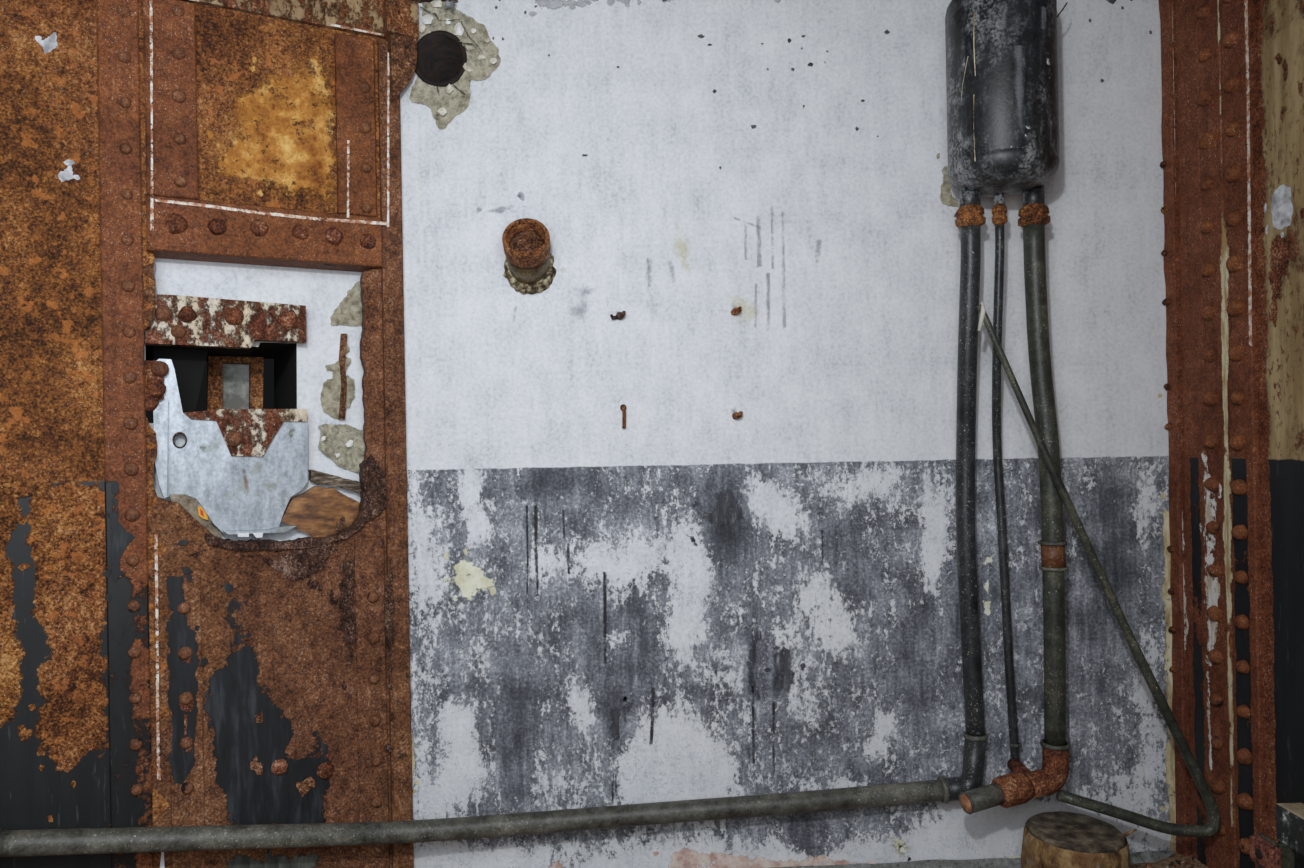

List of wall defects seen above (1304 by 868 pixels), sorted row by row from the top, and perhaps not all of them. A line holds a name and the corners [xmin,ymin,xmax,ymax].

spalling [409,0,504,129]
corrosion [1275,53,1303,97]
peeling [1264,184,1293,238]
corrosion [1258,226,1295,327]
spalling [318,281,365,472]
corrosion [248,523,339,591]
peeling [443,548,496,601]
corrosion [0,474,109,788]
corrosion [250,756,263,775]
corrosion [296,777,316,797]